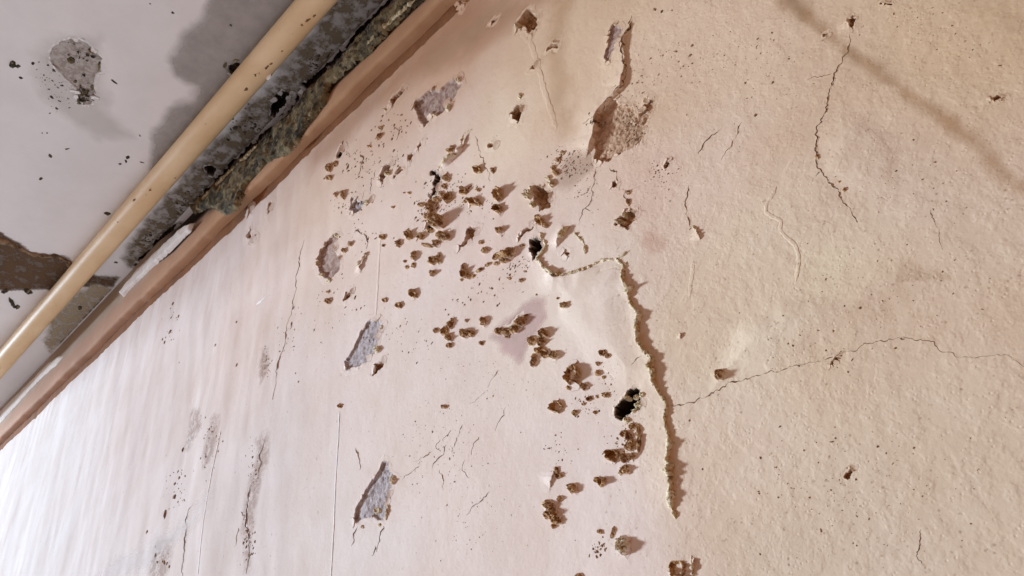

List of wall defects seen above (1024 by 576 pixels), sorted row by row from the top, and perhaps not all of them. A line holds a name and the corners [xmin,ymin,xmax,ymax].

peeling [46,36,107,109]
leakage [126,0,426,266]
peeling [313,71,472,305]
peeling [471,175,601,294]
spalling [567,18,659,170]
spalling [611,204,643,234]
crack [806,33,858,223]
crack [272,242,304,399]
peeling [340,313,388,382]
spalling [609,381,647,425]
crack [555,250,1024,520]
peeling [350,454,399,531]